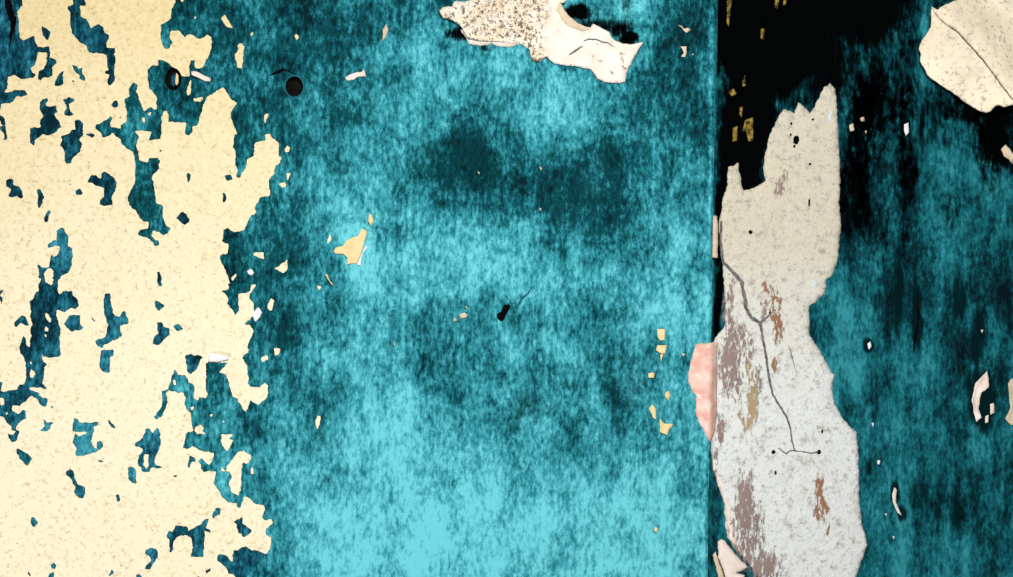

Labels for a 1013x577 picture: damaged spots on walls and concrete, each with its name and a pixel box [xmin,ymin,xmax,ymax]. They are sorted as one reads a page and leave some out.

peeling [439,0,643,83]
peeling [919,0,1013,113]
peeling [0,0,291,577]
peeling [656,329,667,360]
crack [720,221,817,454]
spalling [682,84,867,577]
peeling [649,404,673,435]
peeling [972,371,995,423]
peeling [1005,378,1013,425]